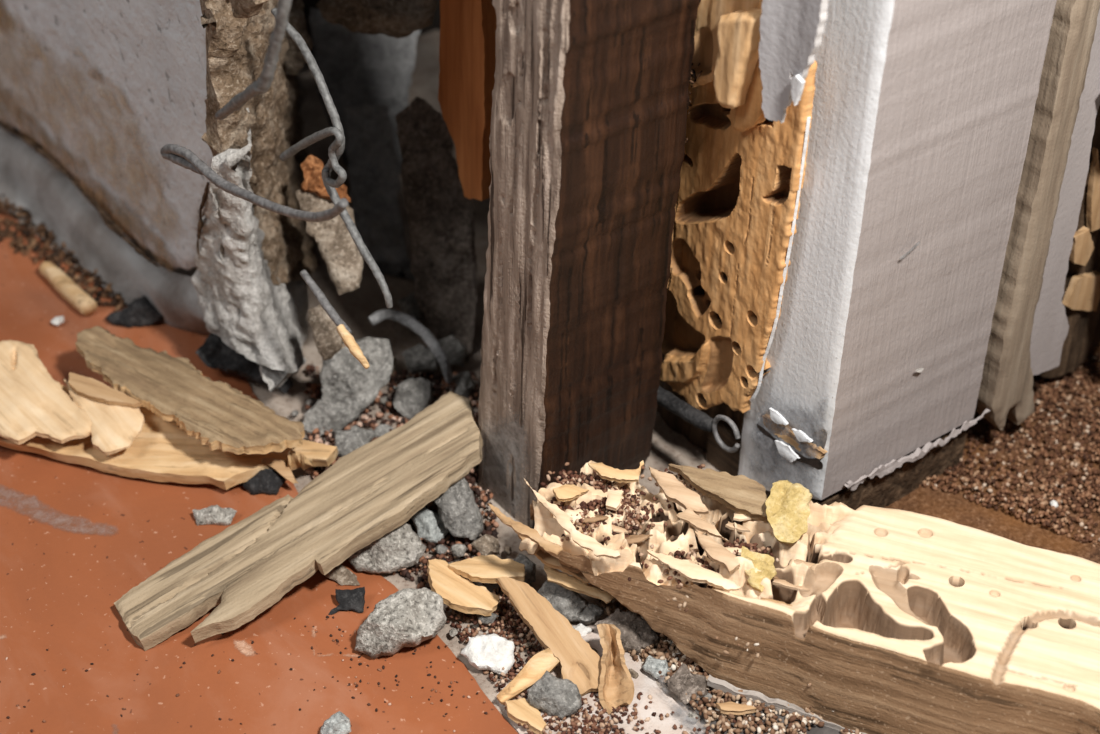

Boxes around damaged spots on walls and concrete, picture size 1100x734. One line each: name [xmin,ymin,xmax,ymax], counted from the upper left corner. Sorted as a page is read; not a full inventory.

spalling [191,0,320,392]
peeling [758,0,829,123]